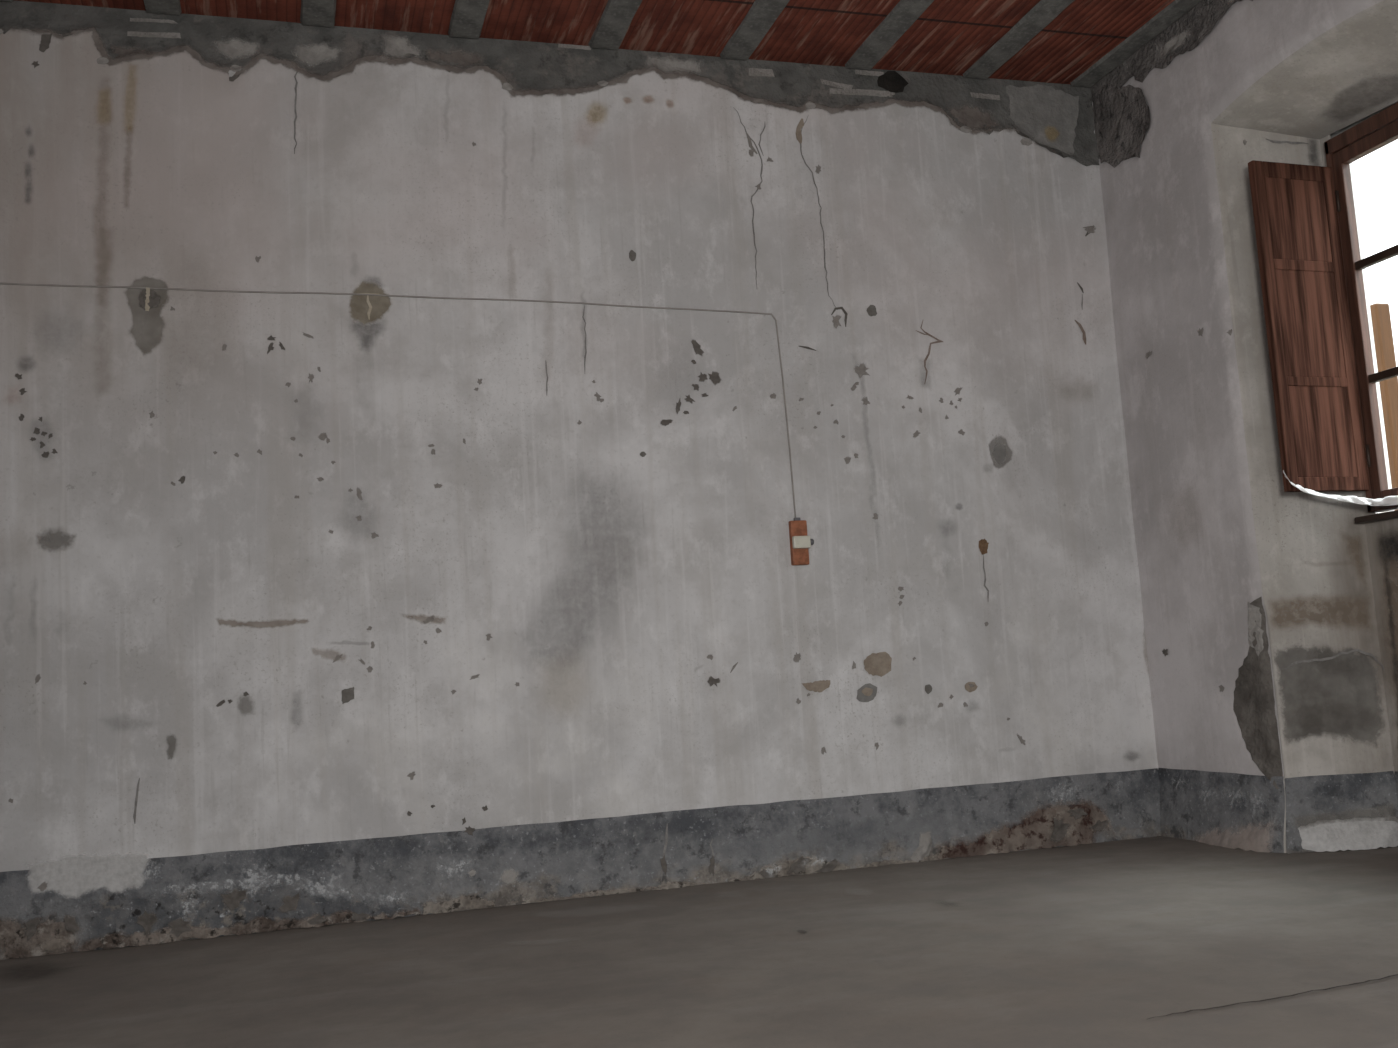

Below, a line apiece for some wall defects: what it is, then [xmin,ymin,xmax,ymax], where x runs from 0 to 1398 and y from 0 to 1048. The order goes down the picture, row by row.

flaking render [0,0,1253,168]
crack [733,107,836,307]
crack [916,321,943,384]
crack [851,364,870,405]
rust [979,538,989,601]
spalling [852,652,892,702]
spalling [1219,597,1283,789]
spalling [938,801,1109,860]
spalling [1296,806,1398,826]
peeling [0,854,849,959]
crack [1148,974,1398,1019]